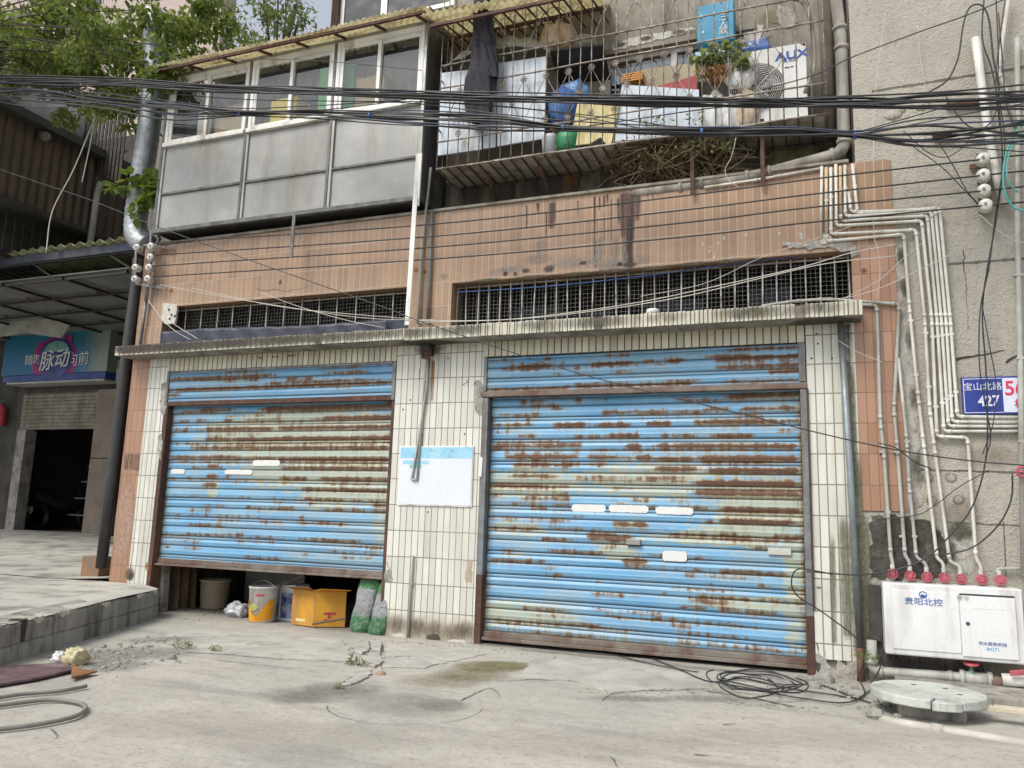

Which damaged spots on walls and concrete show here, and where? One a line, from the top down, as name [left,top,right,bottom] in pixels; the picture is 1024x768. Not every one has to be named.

spalling [869,243,978,581]